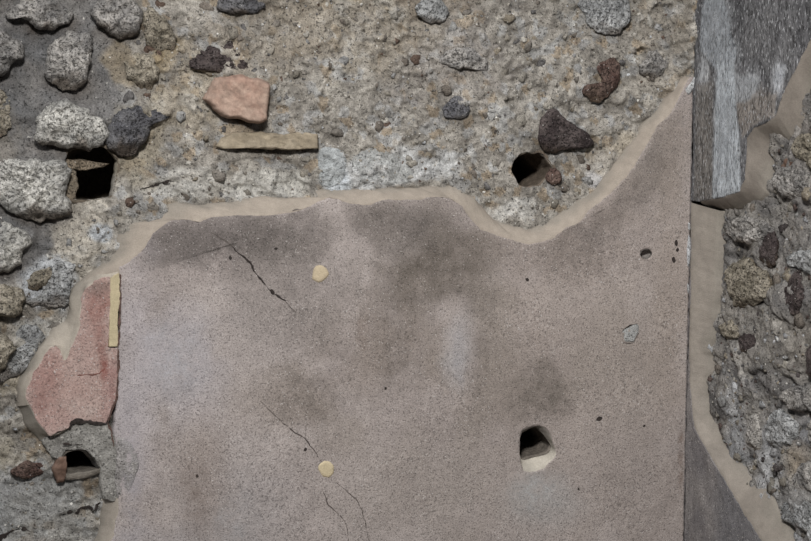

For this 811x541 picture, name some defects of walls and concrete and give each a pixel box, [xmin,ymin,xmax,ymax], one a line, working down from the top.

crack [211,232,296,312]
spalling [672,223,691,298]
spalling [706,89,811,541]
spalling [41,408,139,502]
crack [261,402,322,462]
spalling [519,425,556,472]
crack [322,483,369,541]